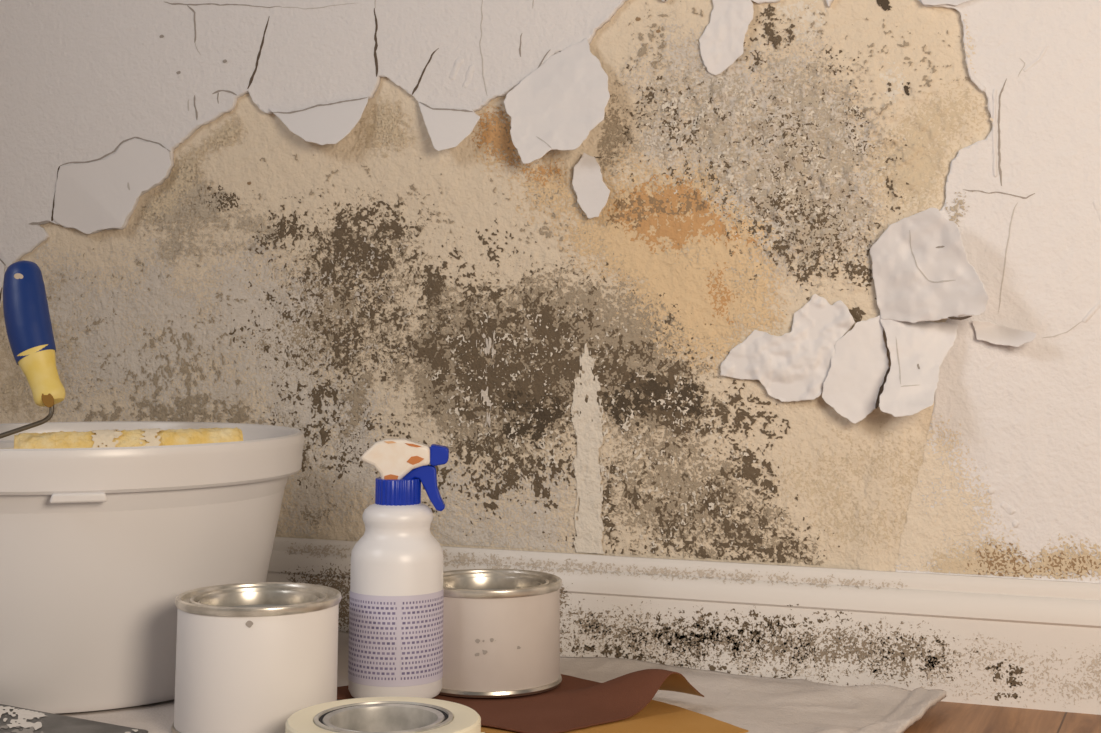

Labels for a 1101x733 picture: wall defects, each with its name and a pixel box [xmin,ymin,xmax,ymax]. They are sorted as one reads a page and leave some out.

crack [165,0,378,120]
crack [412,0,487,112]
crack [519,34,550,68]
crack [29,137,171,225]
crack [963,59,1035,313]
leakage [0,267,82,423]
flaking render [0,0,1037,572]
leakage [83,4,1101,581]
crack [909,230,955,283]
crack [948,314,972,322]
mould [562,597,1026,701]